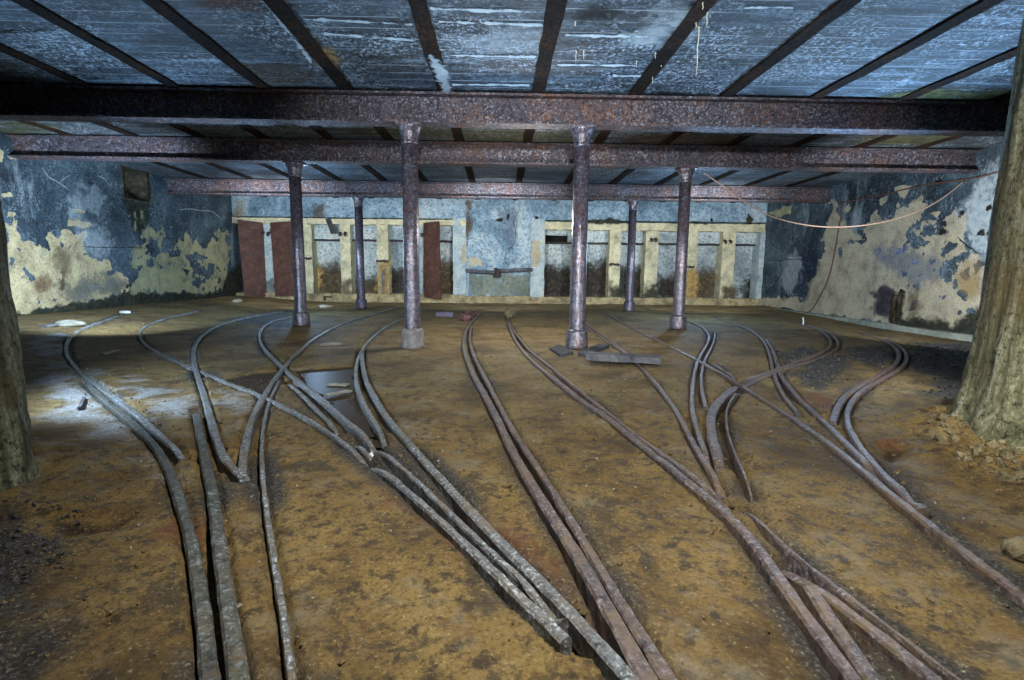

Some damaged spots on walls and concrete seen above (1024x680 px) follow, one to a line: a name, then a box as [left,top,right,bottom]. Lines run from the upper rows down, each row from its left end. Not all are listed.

efflorescence [429,55,530,92]
peeling [5,209,232,315]
water stain [317,261,378,294]
water stain [392,267,404,293]
water stain [441,259,453,294]
water stain [544,264,571,297]
water stain [586,257,675,298]
peeling [761,185,988,330]
water stain [870,286,978,334]